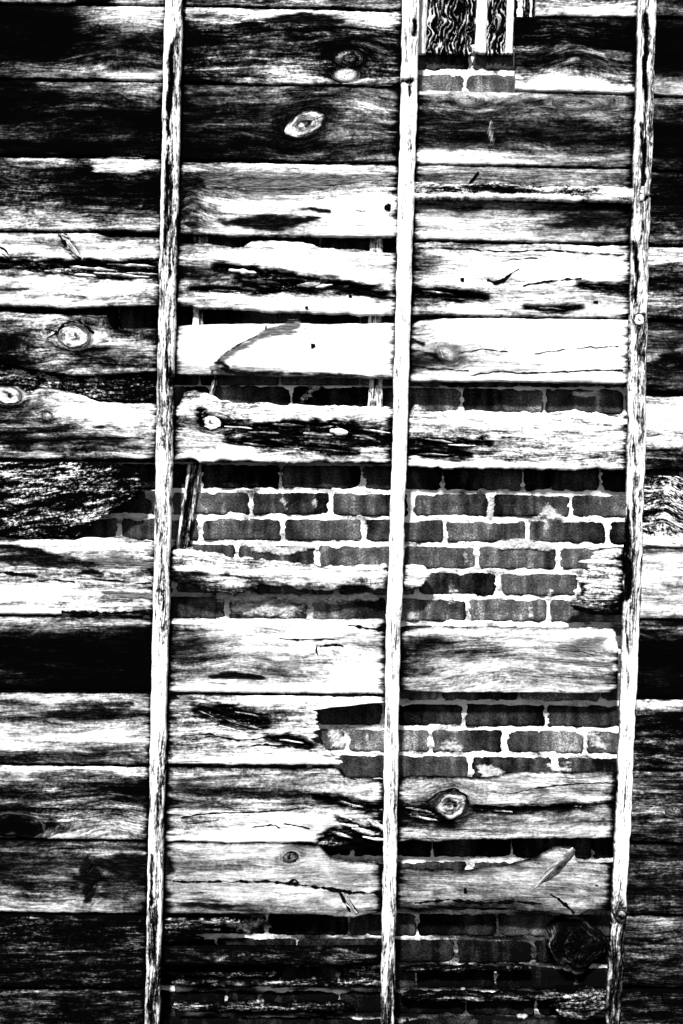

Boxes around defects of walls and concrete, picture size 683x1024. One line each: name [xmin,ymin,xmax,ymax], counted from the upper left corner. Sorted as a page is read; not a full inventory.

crack [173,879,382,913]